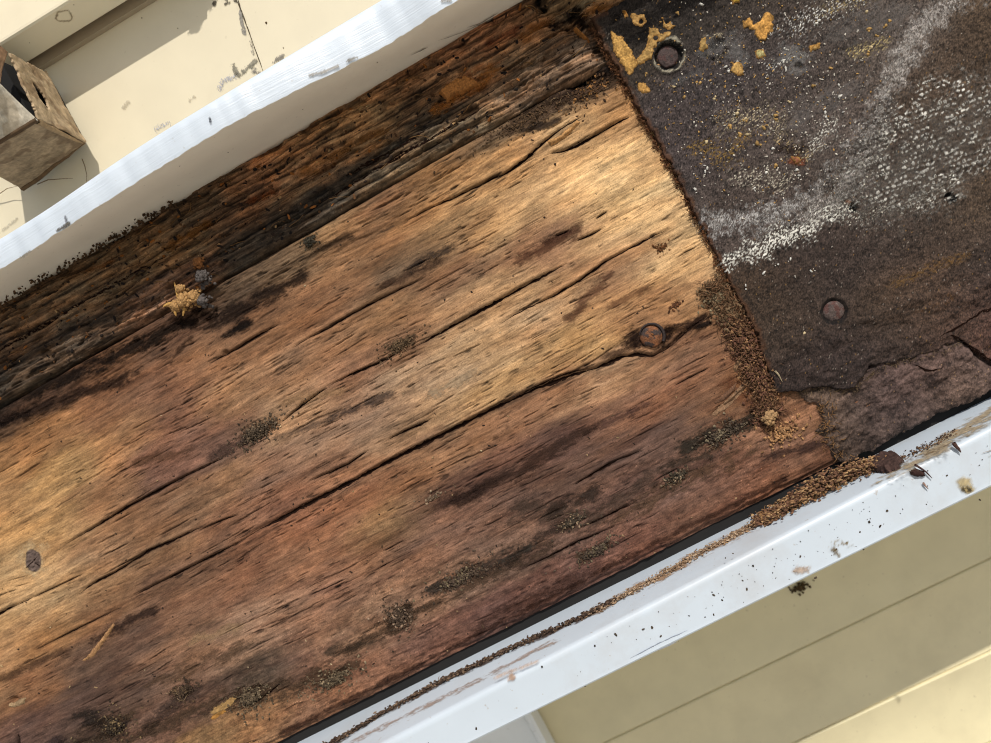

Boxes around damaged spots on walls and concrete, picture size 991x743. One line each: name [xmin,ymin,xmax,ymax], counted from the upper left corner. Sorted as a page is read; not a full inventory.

crack [407,117,629,221]
water stain [521,117,561,132]
water stain [690,0,991,273]
water stain [517,224,581,266]
crack [554,212,606,240]
water stain [0,269,308,428]
crack [285,231,664,420]
water stain [565,273,611,320]
corrosion [605,313,709,359]
water stain [327,392,393,422]
crack [38,317,704,649]
crack [0,515,236,615]